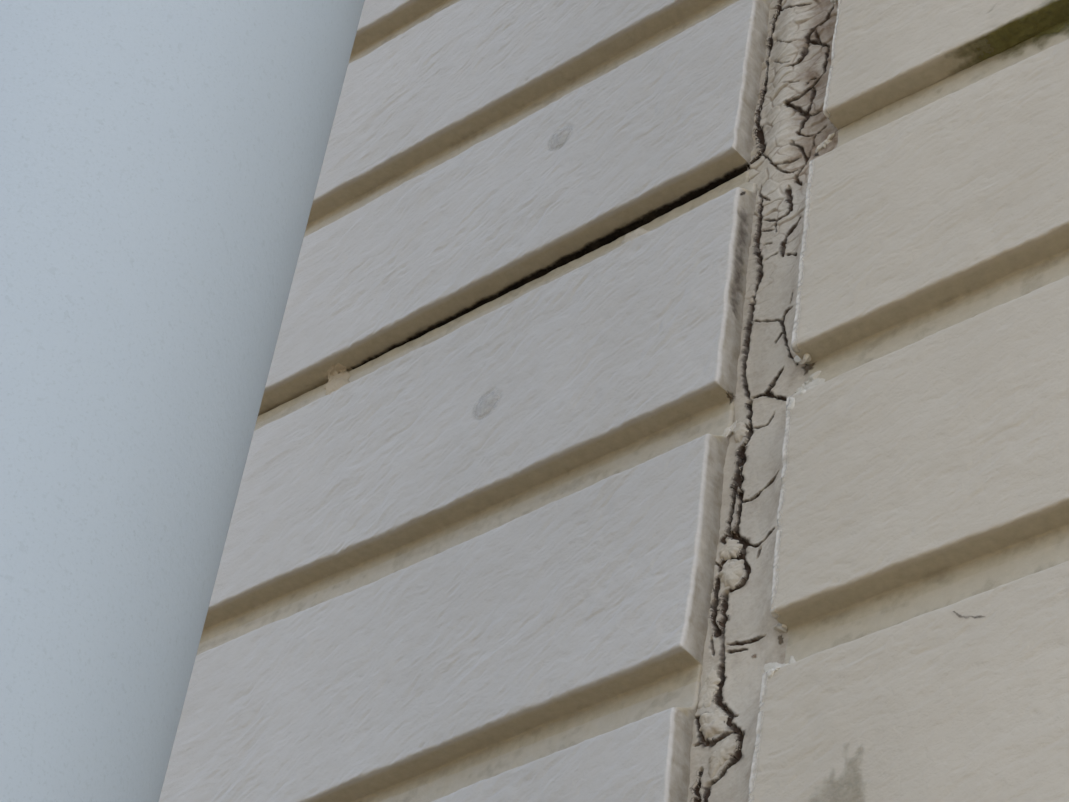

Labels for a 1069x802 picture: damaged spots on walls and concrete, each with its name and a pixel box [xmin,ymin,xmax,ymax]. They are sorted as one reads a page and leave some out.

crack [352,0,834,802]